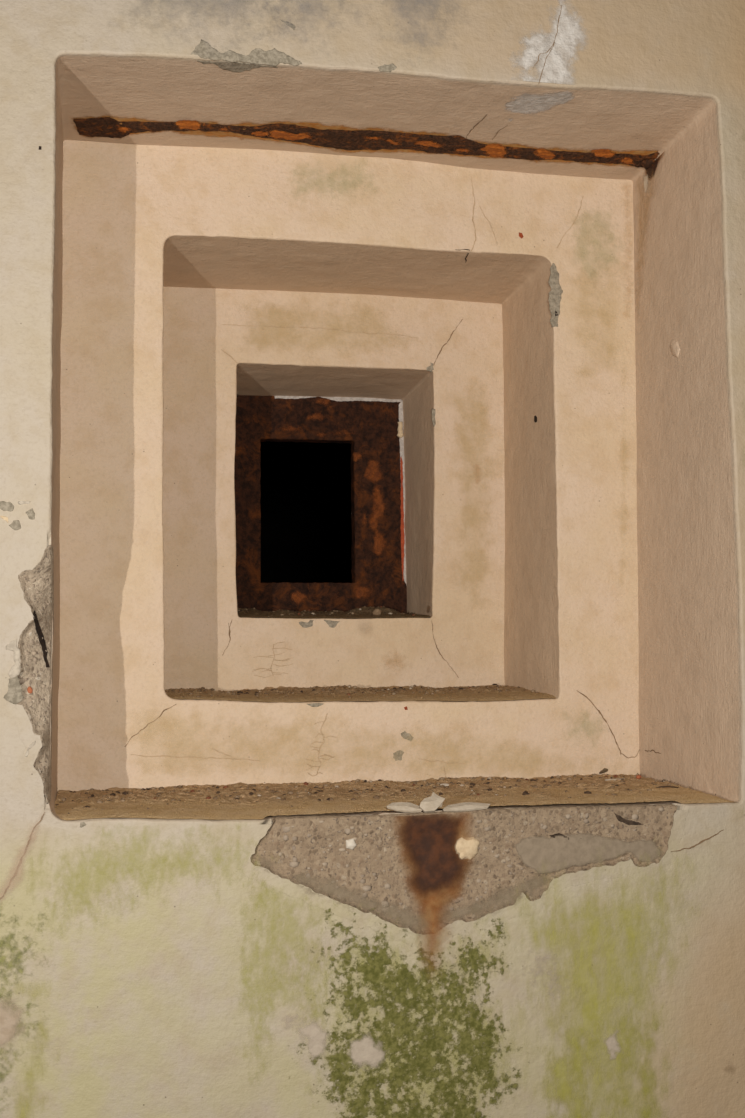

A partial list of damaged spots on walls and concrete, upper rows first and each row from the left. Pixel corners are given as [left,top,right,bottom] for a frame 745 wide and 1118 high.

flaking render [190,40,302,72]
damp [506,0,584,121]
corrosion [73,116,663,193]
flaking render [548,263,563,327]
corrosion [354,453,385,555]
spalling [0,501,54,817]
crack [578,691,661,758]
crack [0,812,45,899]
corrosion [401,816,468,951]
spalling [235,795,688,948]